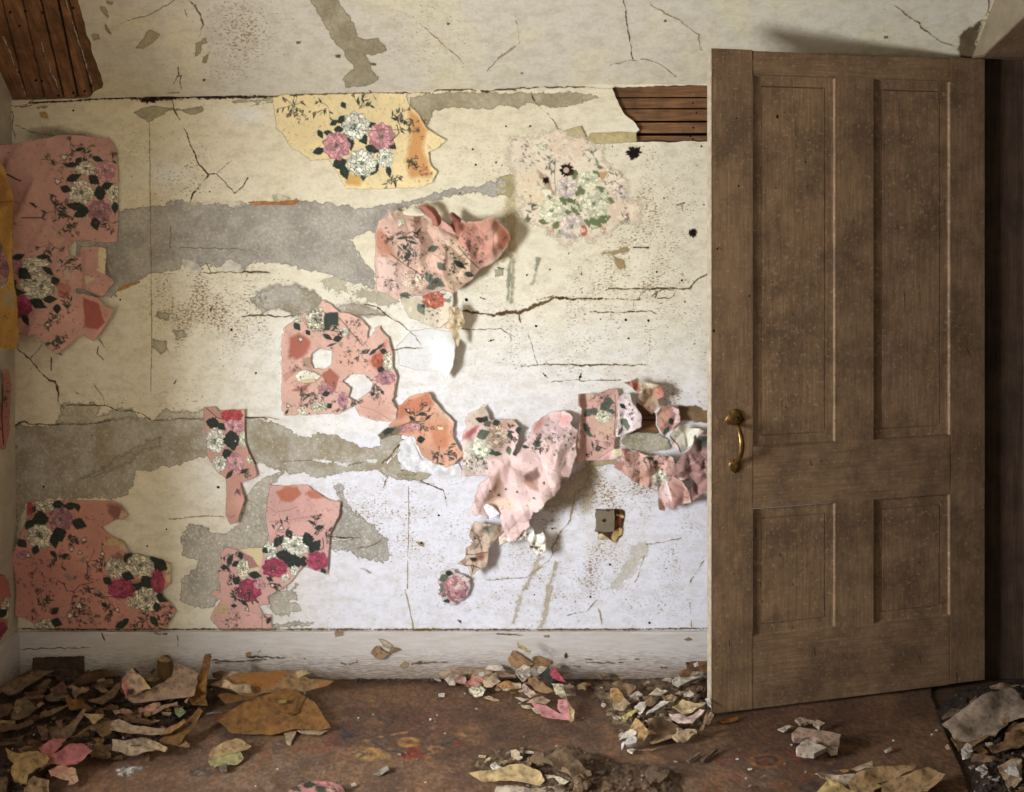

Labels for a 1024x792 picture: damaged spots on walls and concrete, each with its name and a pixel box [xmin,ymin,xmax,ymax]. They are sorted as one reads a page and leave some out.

flaking render [0,0,113,100]
flaking render [310,0,387,88]
crack [172,66,247,202]
flaking render [564,85,707,160]
crack [149,128,270,274]
flaking render [76,174,515,298]
crack [462,274,707,382]
flaking render [15,402,207,527]
flaking render [180,418,462,608]
flaking render [270,583,314,629]